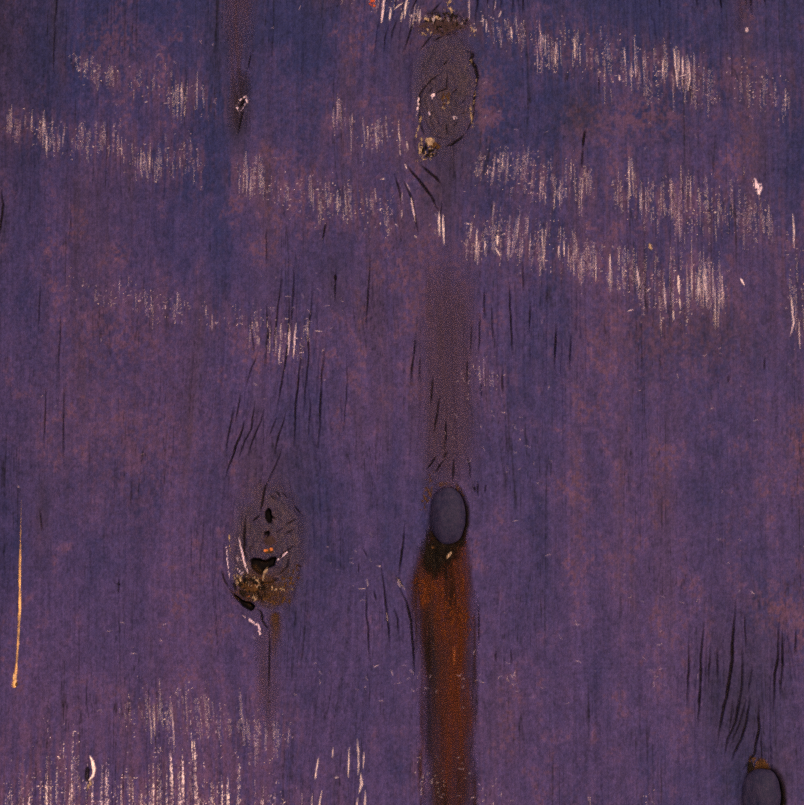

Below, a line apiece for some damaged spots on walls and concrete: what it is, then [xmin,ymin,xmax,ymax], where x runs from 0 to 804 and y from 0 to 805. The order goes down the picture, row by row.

corrosion [414,540,475,805]
crack [687,641,710,714]
crack [720,620,762,760]
crack [773,635,796,686]
peeling [85,757,117,804]